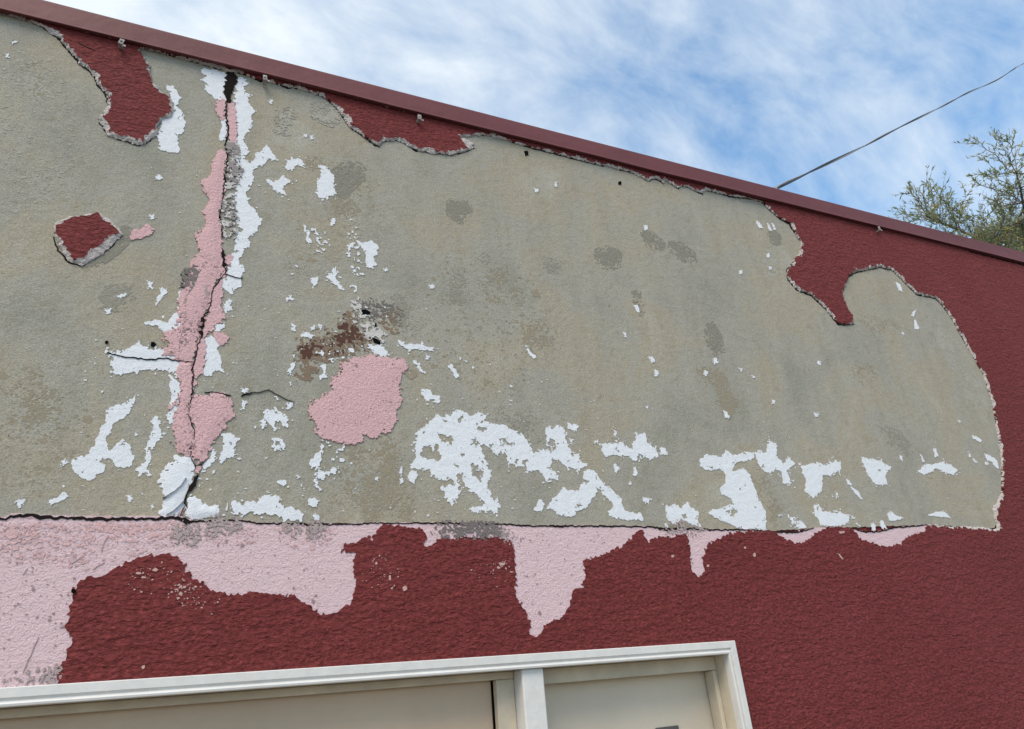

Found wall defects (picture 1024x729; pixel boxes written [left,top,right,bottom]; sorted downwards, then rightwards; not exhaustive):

rust [293,308,405,383]
crack [0,51,814,569]
spalling [0,13,1005,577]
peeling [0,516,379,688]
peeling [488,524,652,637]
crack [849,524,927,533]